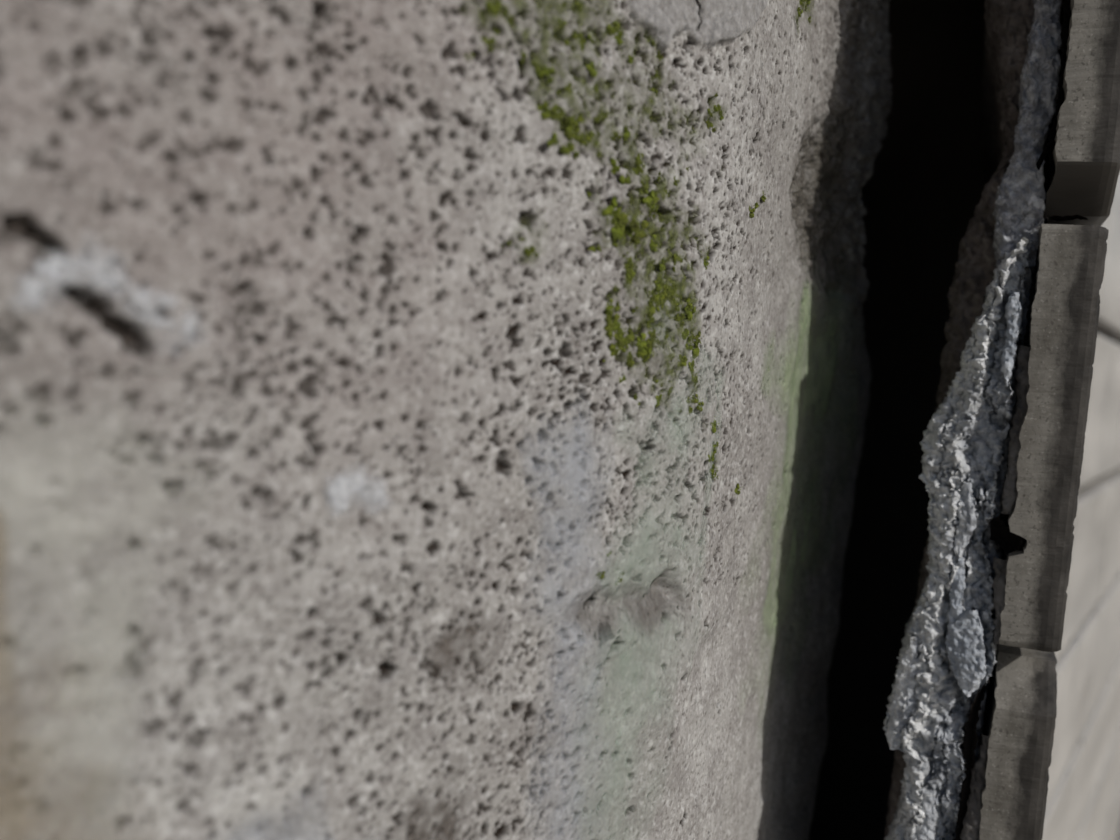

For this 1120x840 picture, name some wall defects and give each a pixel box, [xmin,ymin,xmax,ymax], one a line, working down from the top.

spalling [883,237,1034,840]
crack [953,676,990,840]